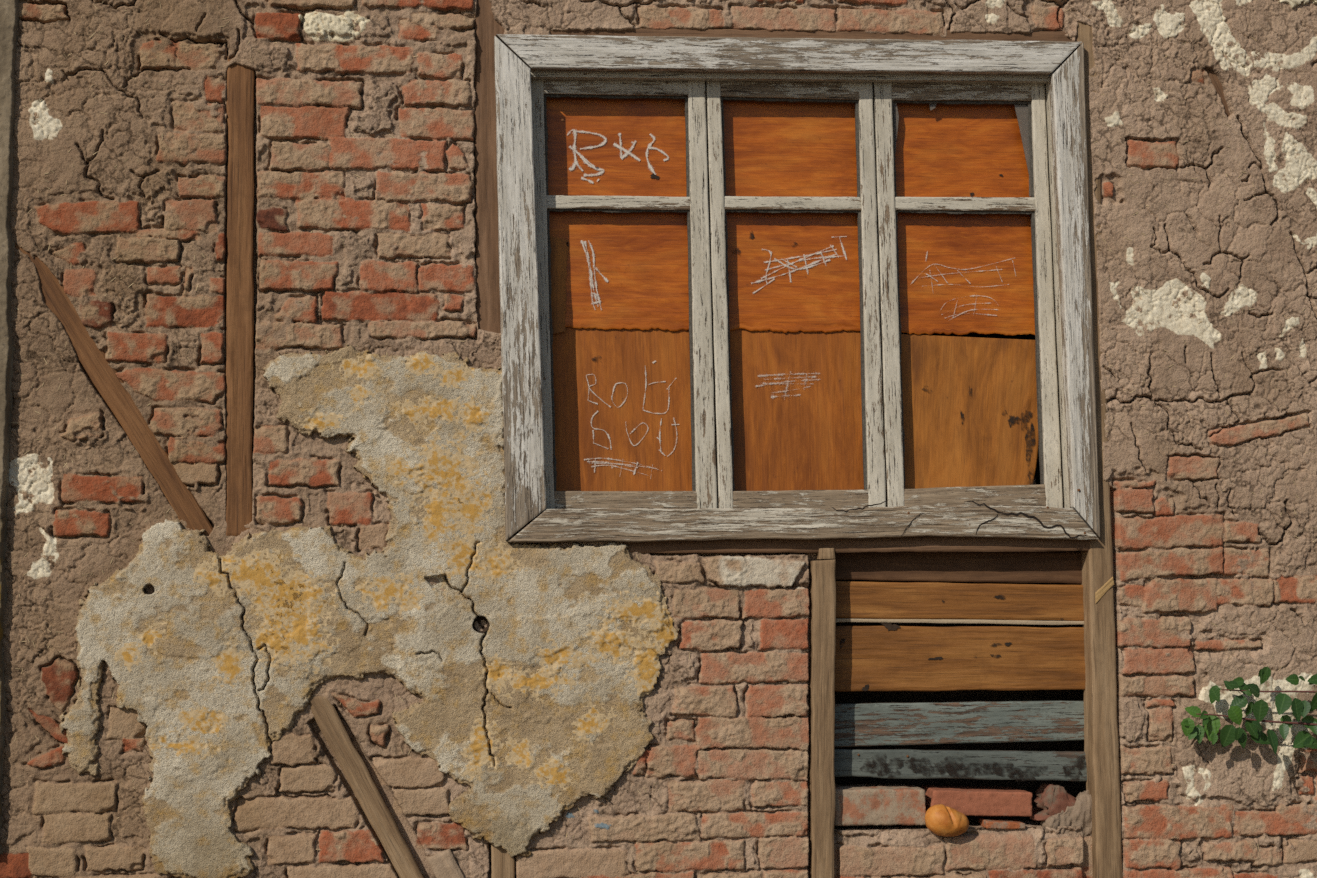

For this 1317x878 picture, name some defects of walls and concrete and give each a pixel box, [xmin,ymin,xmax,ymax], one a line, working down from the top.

crack [63,0,256,116]
spalling [630,0,949,38]
peeling [984,0,1006,25]
spalling [1022,0,1071,36]
crack [78,131,155,200]
crack [1151,119,1317,319]
peeling [0,0,811,878]
crack [1107,347,1277,451]
crack [220,560,271,738]
crack [445,543,511,765]
spalling [1109,411,1317,878]